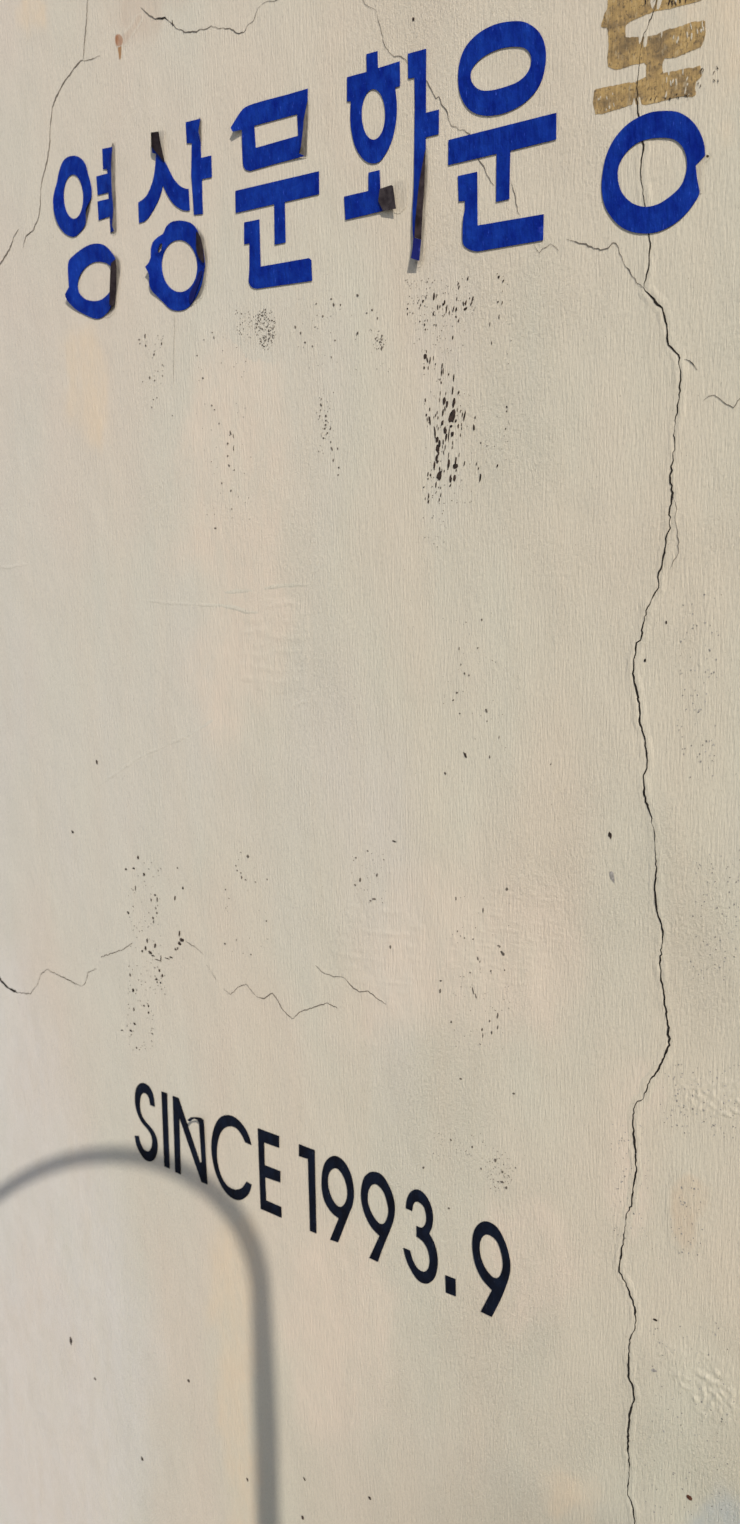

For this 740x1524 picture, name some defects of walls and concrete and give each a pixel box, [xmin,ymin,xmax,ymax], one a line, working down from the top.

crack [142,0,276,34]
crack [0,0,96,264]
crack [363,0,739,1524]
crack [0,944,130,994]
crack [189,943,385,1019]